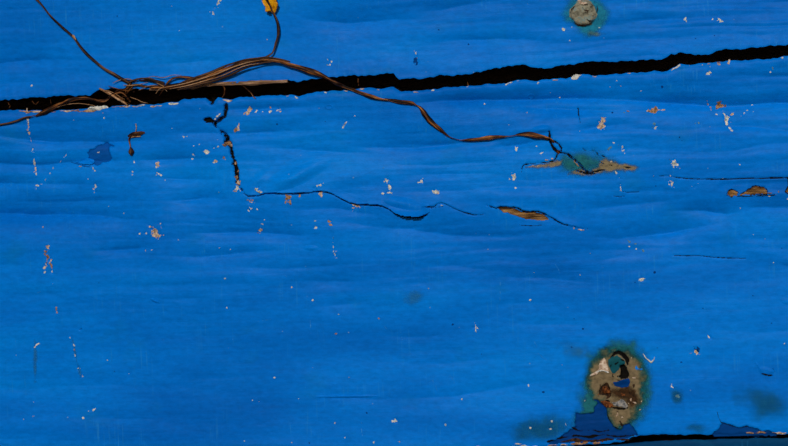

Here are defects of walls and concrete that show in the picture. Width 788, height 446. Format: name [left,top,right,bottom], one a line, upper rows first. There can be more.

crack [204,96,243,191]
crack [521,131,630,175]
peeling [668,160,788,200]
peeling [487,205,584,231]
peeling [547,347,658,446]